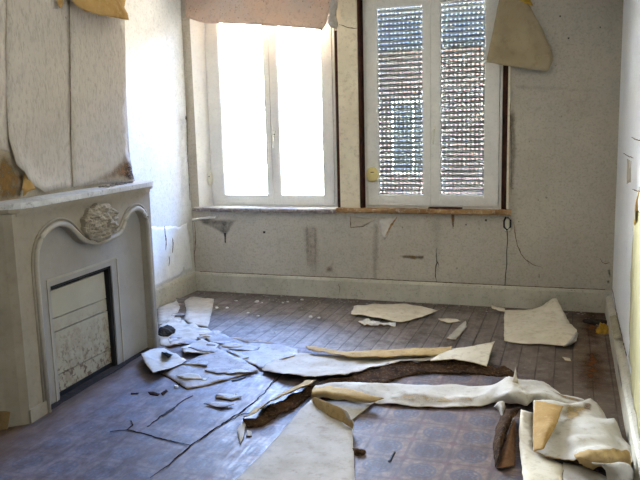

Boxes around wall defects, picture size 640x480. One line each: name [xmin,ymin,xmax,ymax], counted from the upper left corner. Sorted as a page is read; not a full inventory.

water stain [202,219,231,243]
peeling [350,216,397,240]
crack [194,222,627,357]
crack [110,363,282,478]